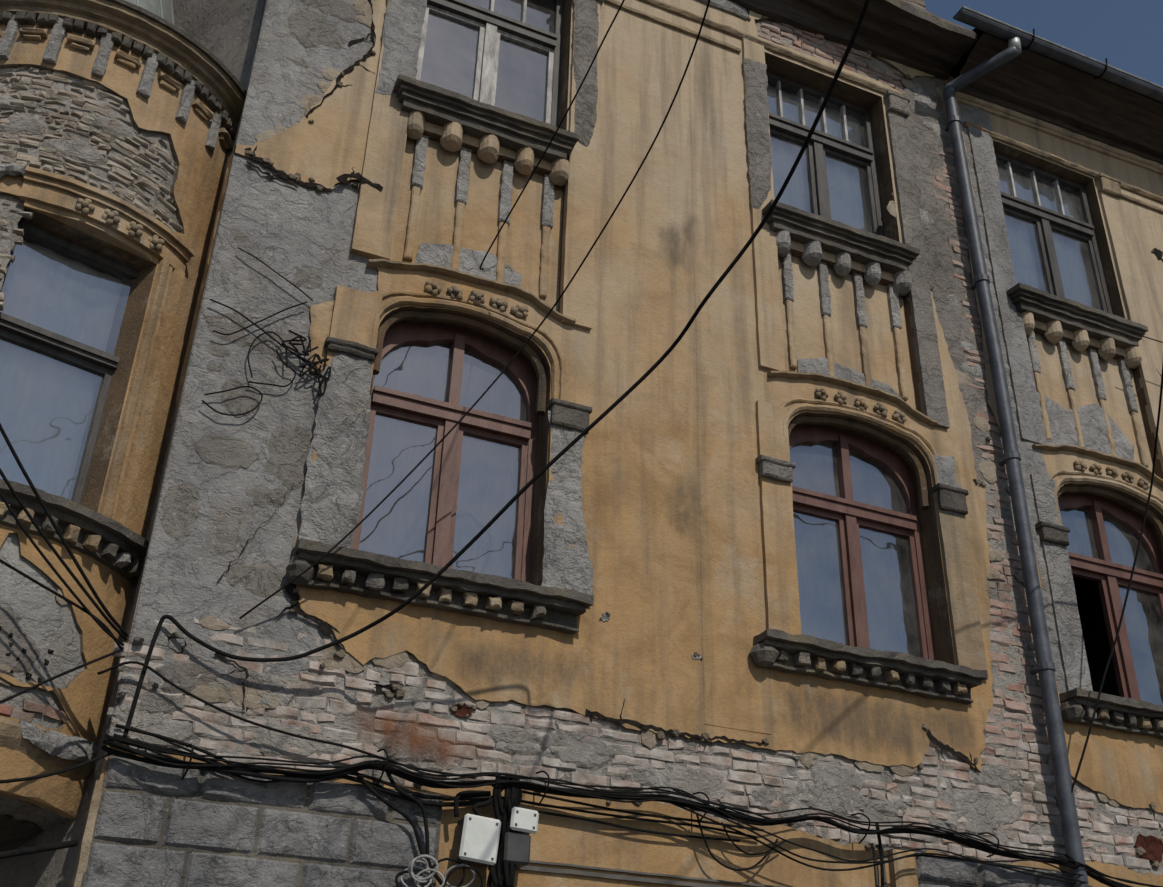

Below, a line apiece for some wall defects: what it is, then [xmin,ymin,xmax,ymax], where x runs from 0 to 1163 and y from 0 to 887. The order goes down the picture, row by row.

crack [306,0,376,123]
flaking render [747,16,912,93]
flaking render [0,626,68,729]
flaking render [107,407,1066,864]
flaking render [1072,779,1163,875]